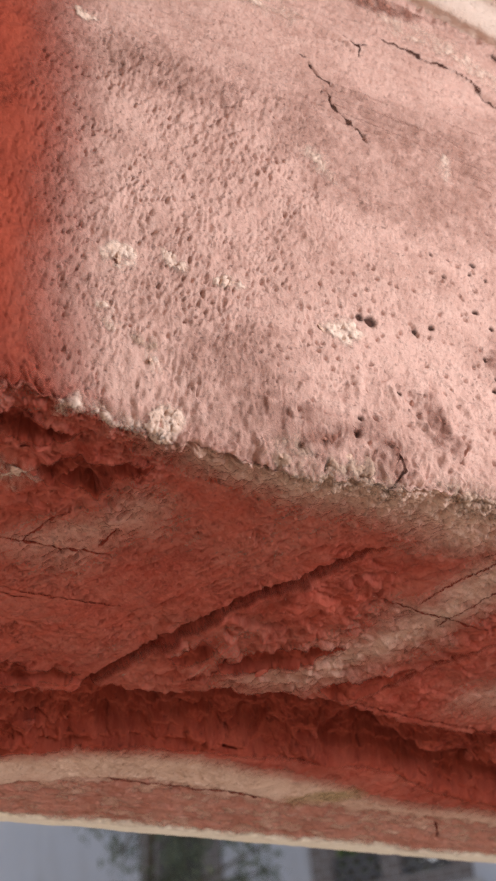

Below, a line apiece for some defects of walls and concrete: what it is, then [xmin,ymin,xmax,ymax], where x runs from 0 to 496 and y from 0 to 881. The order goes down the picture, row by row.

crack [343,35,496,108]
crack [299,54,365,142]
spalling [0,406,77,448]
peeling [144,404,185,445]
spalling [29,454,156,500]
crack [0,511,115,555]
crack [364,564,496,631]
spalling [172,641,345,677]
spalling [0,660,496,808]
crack [106,777,259,799]
peeling [0,778,496,856]